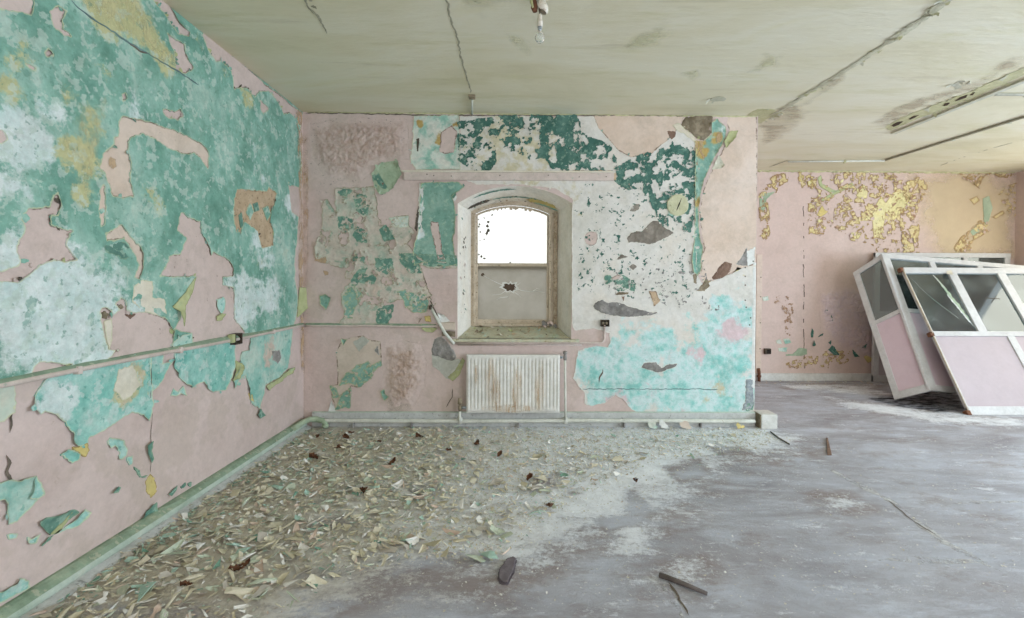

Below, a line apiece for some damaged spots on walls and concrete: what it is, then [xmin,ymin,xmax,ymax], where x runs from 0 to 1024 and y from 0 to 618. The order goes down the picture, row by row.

crack [72,1,198,85]
crack [308,0,681,117]
crack [770,0,952,116]
peeling [954,173,1017,252]
peeling [0,0,928,519]
crack [483,275,545,299]
peeling [0,476,92,546]
crack [830,470,991,567]
peeling [0,578,31,603]